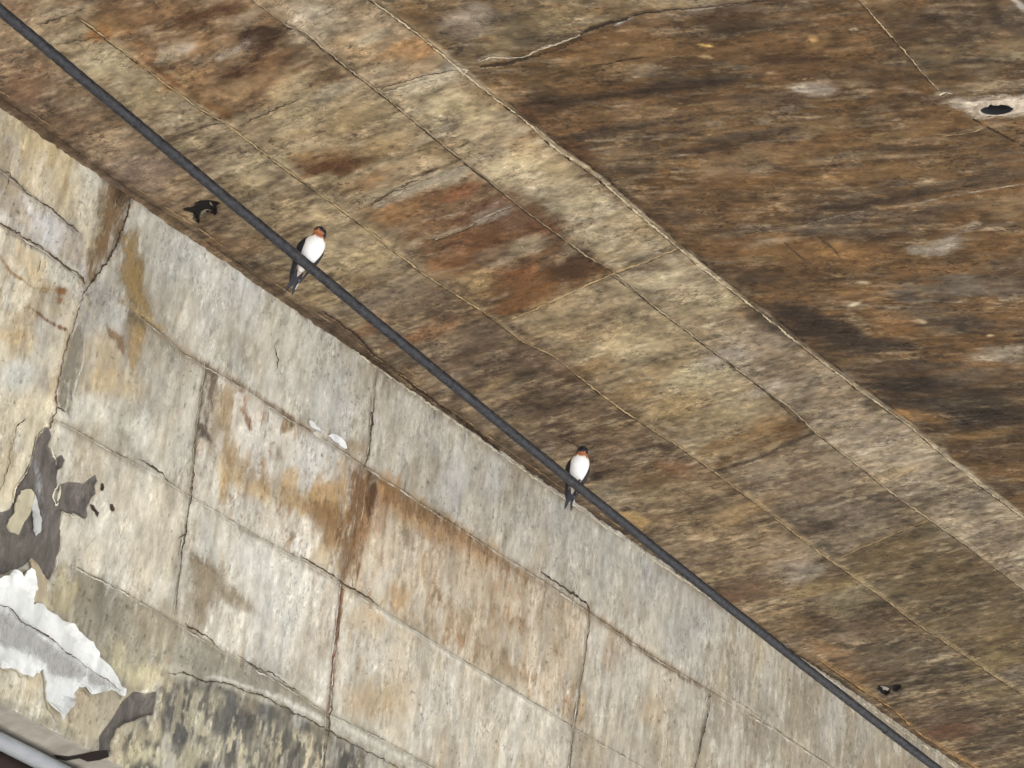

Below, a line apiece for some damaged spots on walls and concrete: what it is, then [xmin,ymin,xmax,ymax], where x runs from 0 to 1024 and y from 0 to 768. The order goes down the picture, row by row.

crack [380,0,768,93]
peeling [309,420,347,449]
peeling [0,427,127,722]
crack [54,372,398,768]
damp [211,673,421,766]